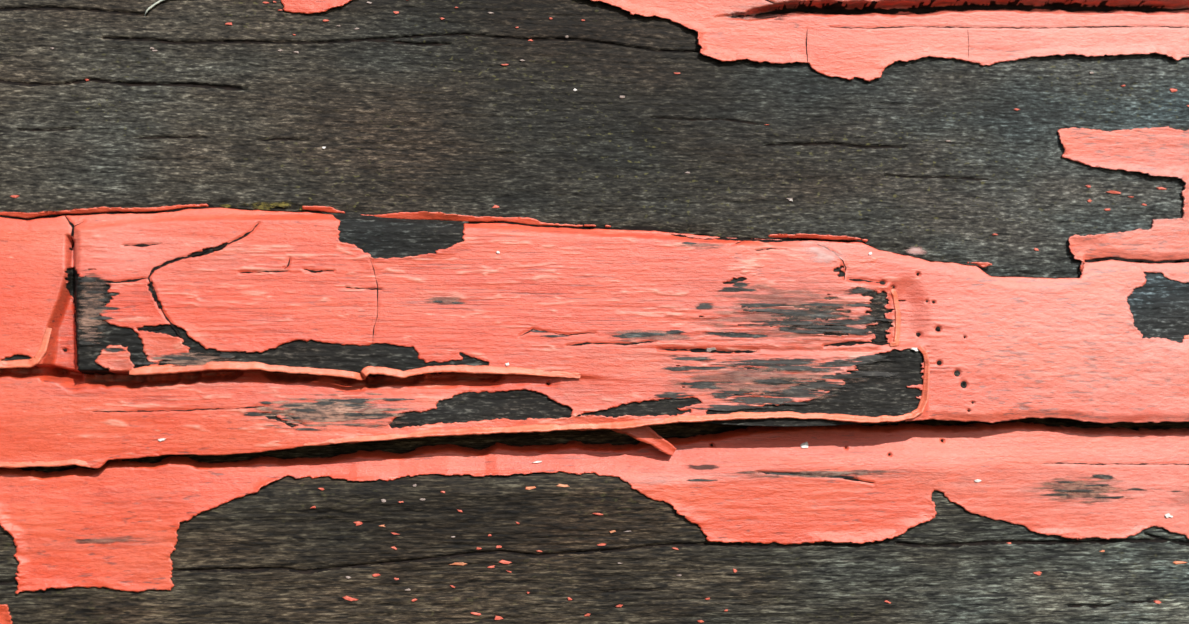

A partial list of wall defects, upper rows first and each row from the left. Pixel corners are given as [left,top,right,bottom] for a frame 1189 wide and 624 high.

crack [0,6,698,53]
crack [0,78,246,90]
peeling [0,0,1189,278]
crack [0,205,221,250]
crack [91,223,259,340]
crack [242,259,382,335]
crack [467,221,879,283]
peeling [1127,272,1189,343]
peeling [0,327,52,368]
peeling [60,267,942,456]
peeling [688,465,718,481]
peeling [0,470,1189,624]